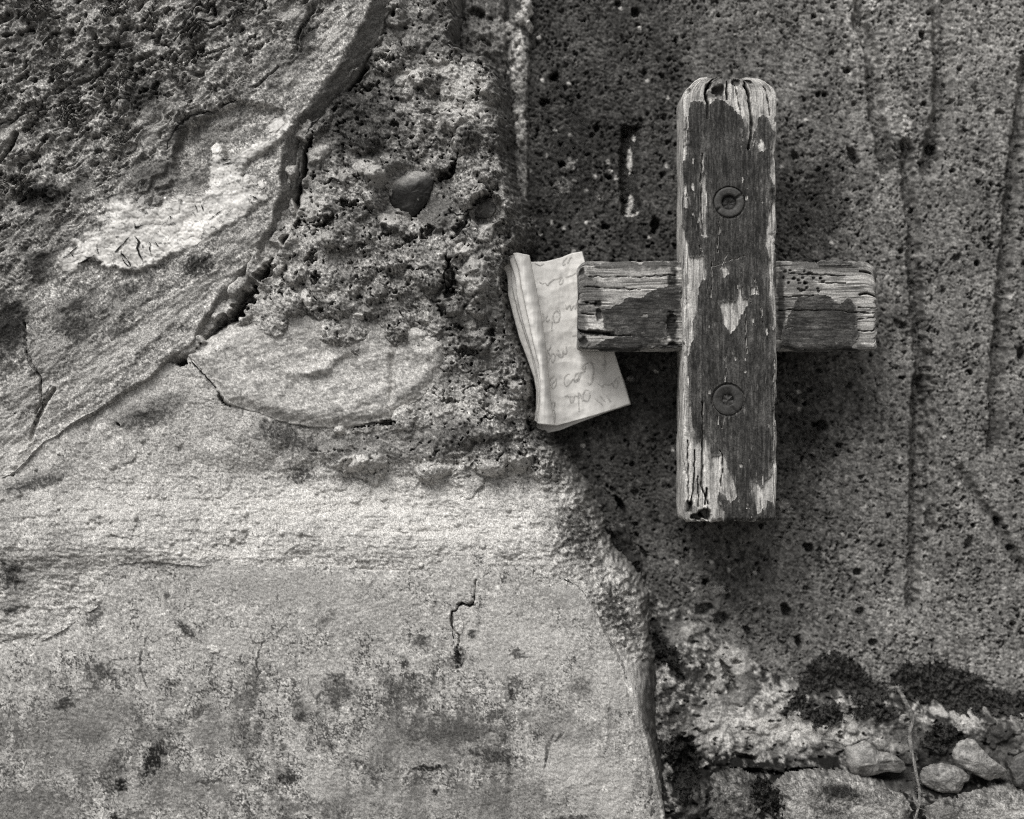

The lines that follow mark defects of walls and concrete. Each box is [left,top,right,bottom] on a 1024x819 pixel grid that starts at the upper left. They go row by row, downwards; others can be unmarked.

crack [167,100,236,149]
water stain [892,105,925,147]
crack [433,571,491,645]
water stain [958,712,974,726]